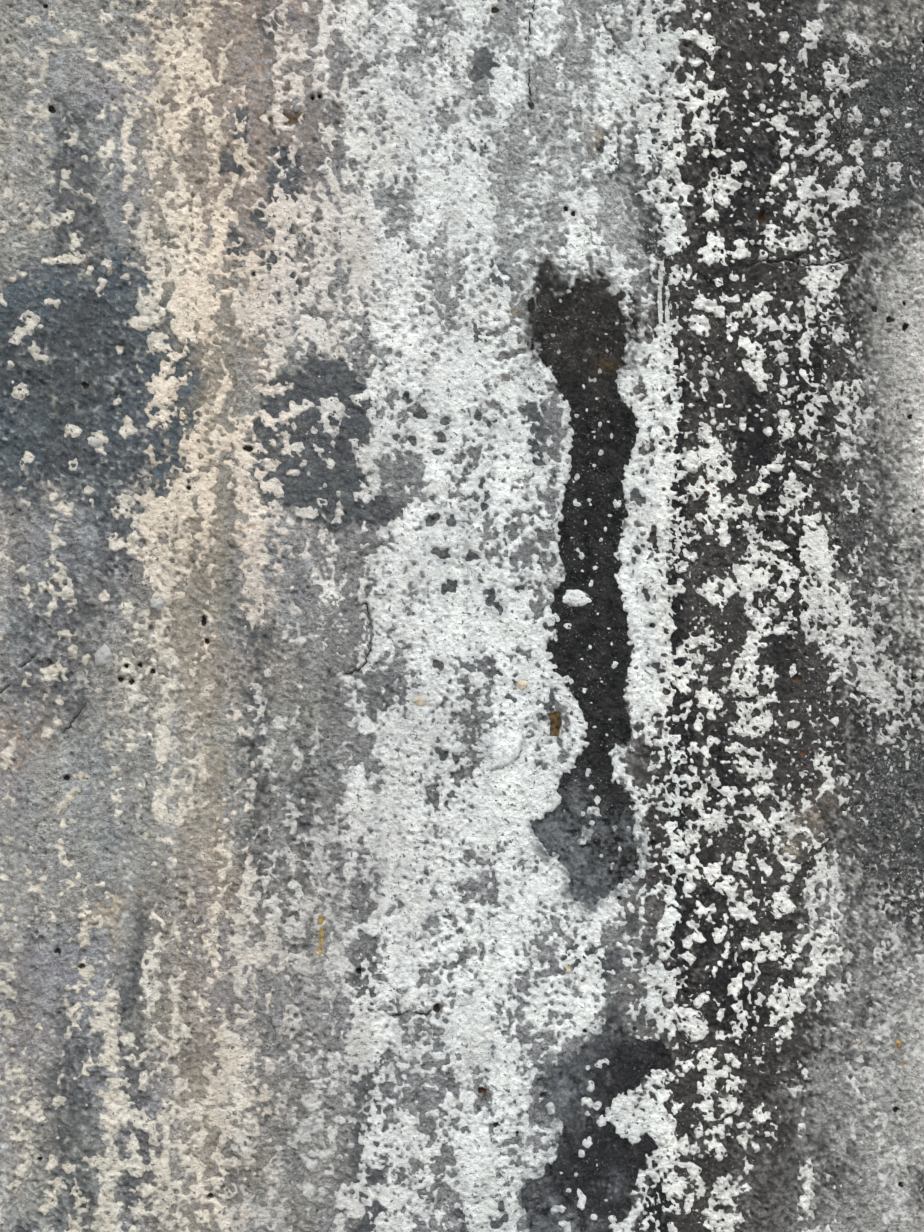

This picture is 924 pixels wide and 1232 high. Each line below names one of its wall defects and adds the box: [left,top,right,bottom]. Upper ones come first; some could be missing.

peeling [722,0,793,51]
peeling [788,0,830,68]
peeling [893,17,924,72]
peeling [872,138,892,157]
crack [747,251,853,273]
peeling [578,768,602,845]
peeling [814,869,924,1232]
peeling [780,1061,809,1098]
peeling [578,1136,593,1158]
peeling [798,1107,806,1139]
peeling [550,1188,598,1232]
peeling [796,1159,842,1232]